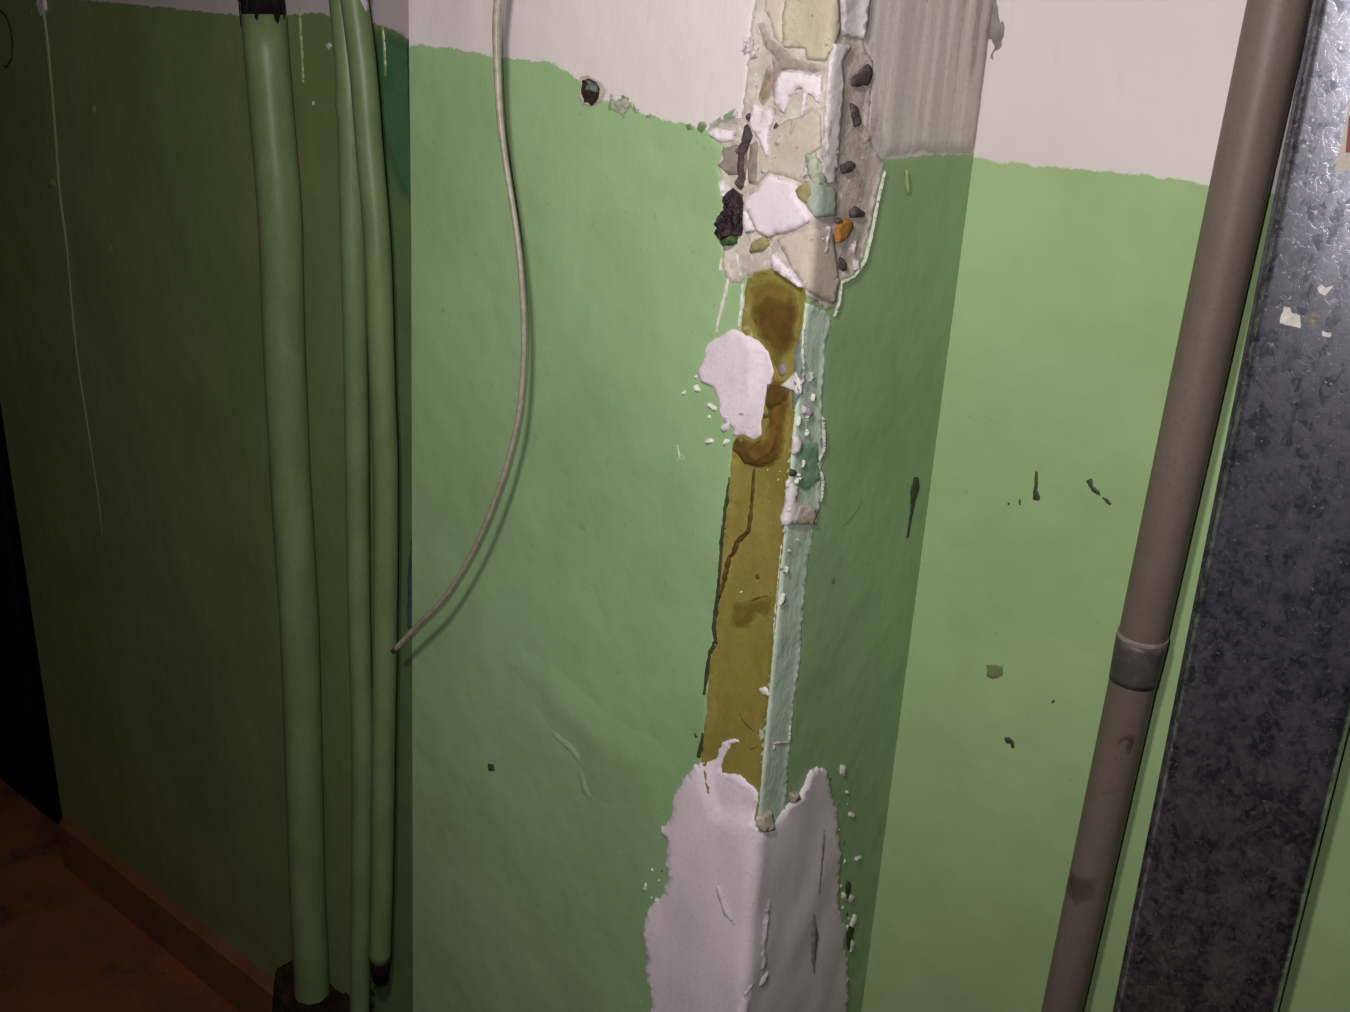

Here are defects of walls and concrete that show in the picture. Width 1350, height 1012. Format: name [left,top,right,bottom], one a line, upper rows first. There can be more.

spalling [579,75,651,118]
spalling [686,0,887,832]
crack [718,468,756,598]